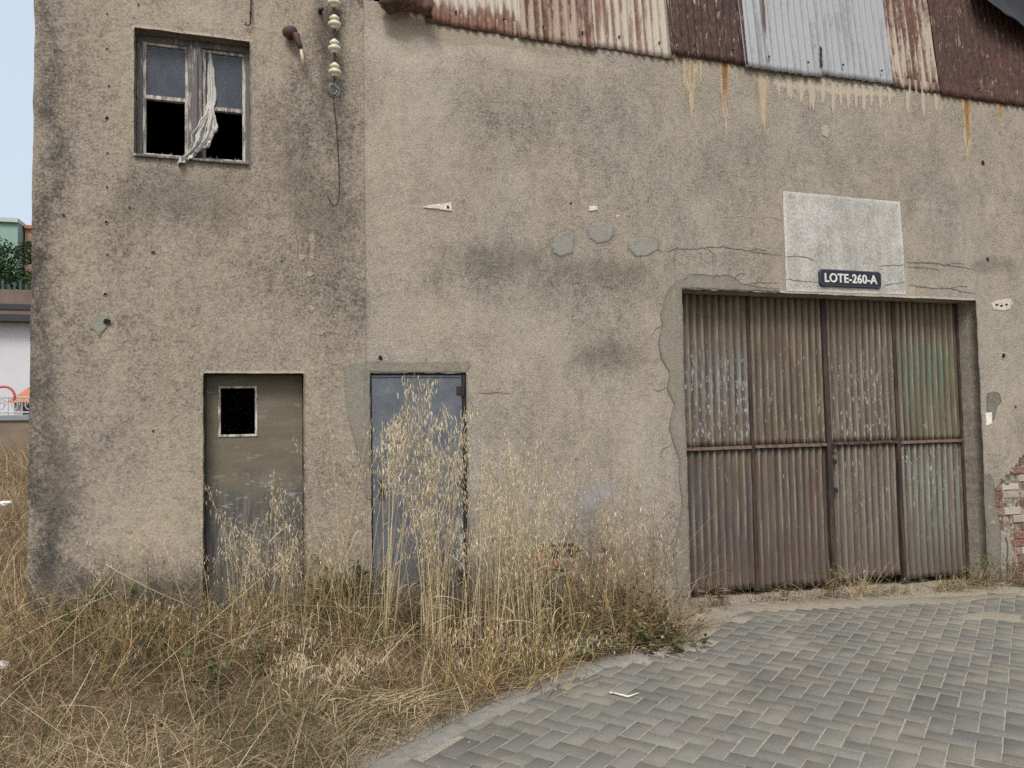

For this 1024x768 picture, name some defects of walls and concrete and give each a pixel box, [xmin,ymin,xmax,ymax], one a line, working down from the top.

corrosion [682,55,702,119]
corrosion [719,60,731,135]
corrosion [756,68,768,131]
corrosion [960,98,973,162]
crack [883,262,976,294]
flaking render [989,455,1024,581]